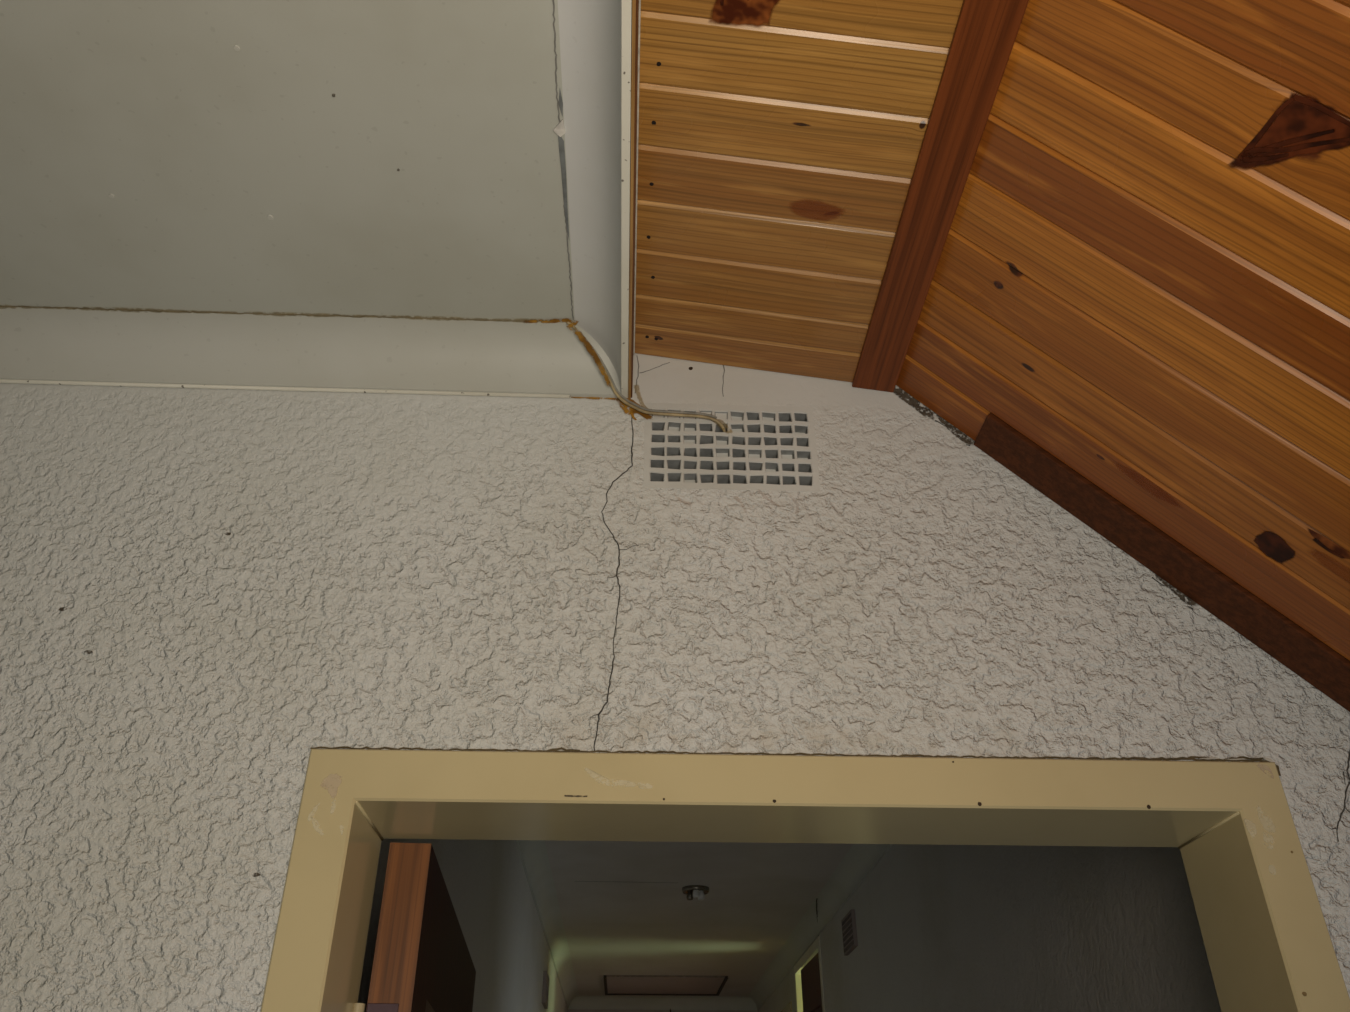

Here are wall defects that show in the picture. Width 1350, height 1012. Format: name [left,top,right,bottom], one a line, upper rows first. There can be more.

crack [310,355,1281,776]
crack [1327,751,1350,842]